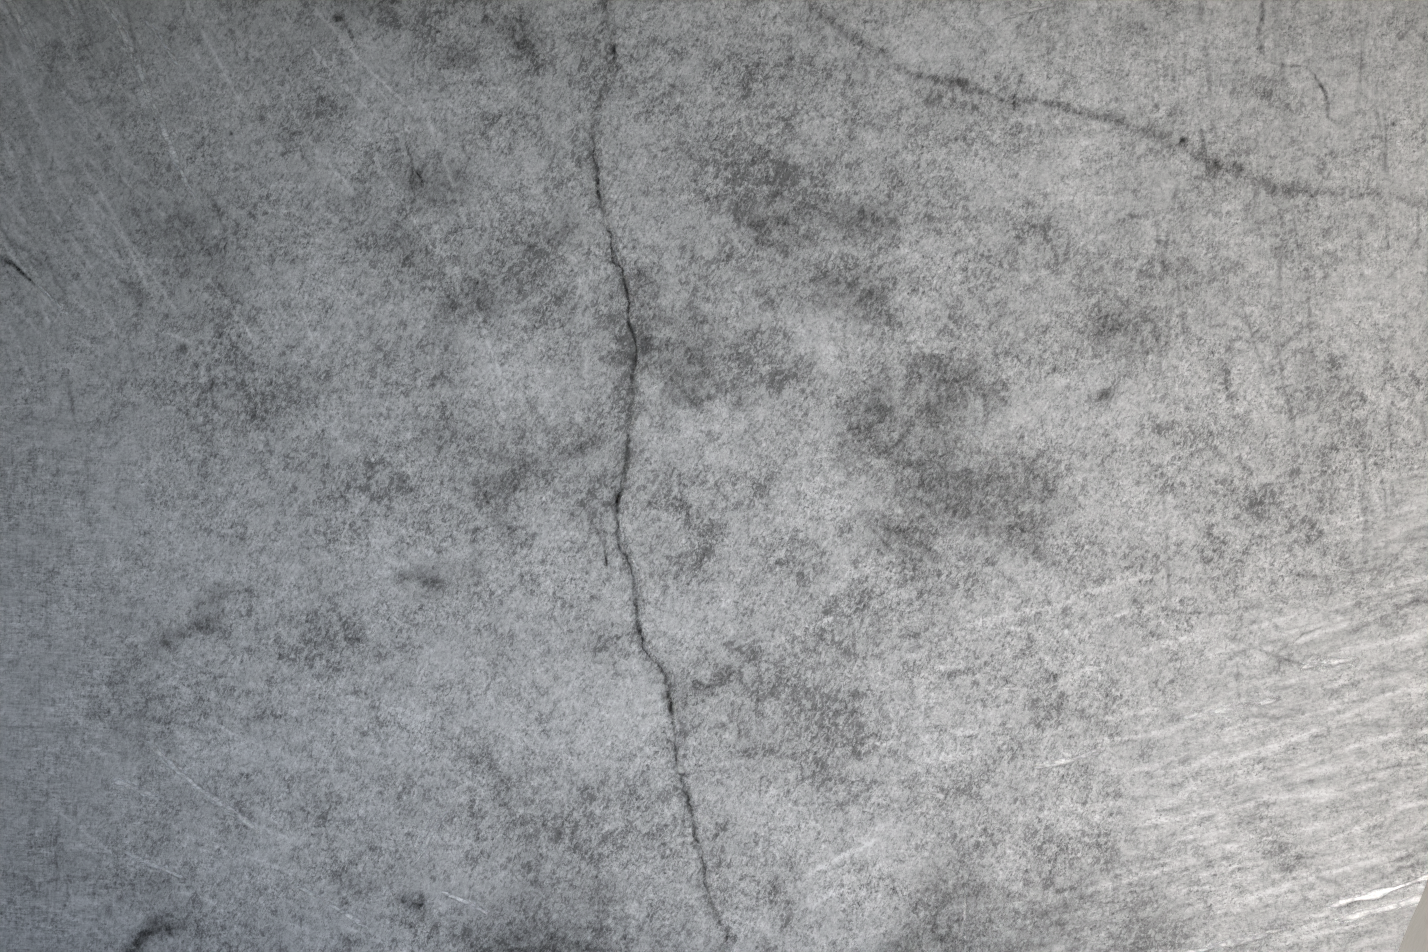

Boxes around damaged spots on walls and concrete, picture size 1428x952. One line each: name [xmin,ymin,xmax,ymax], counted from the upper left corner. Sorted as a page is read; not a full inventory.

crack [593,148,601,203]
crack [611,247,637,383]